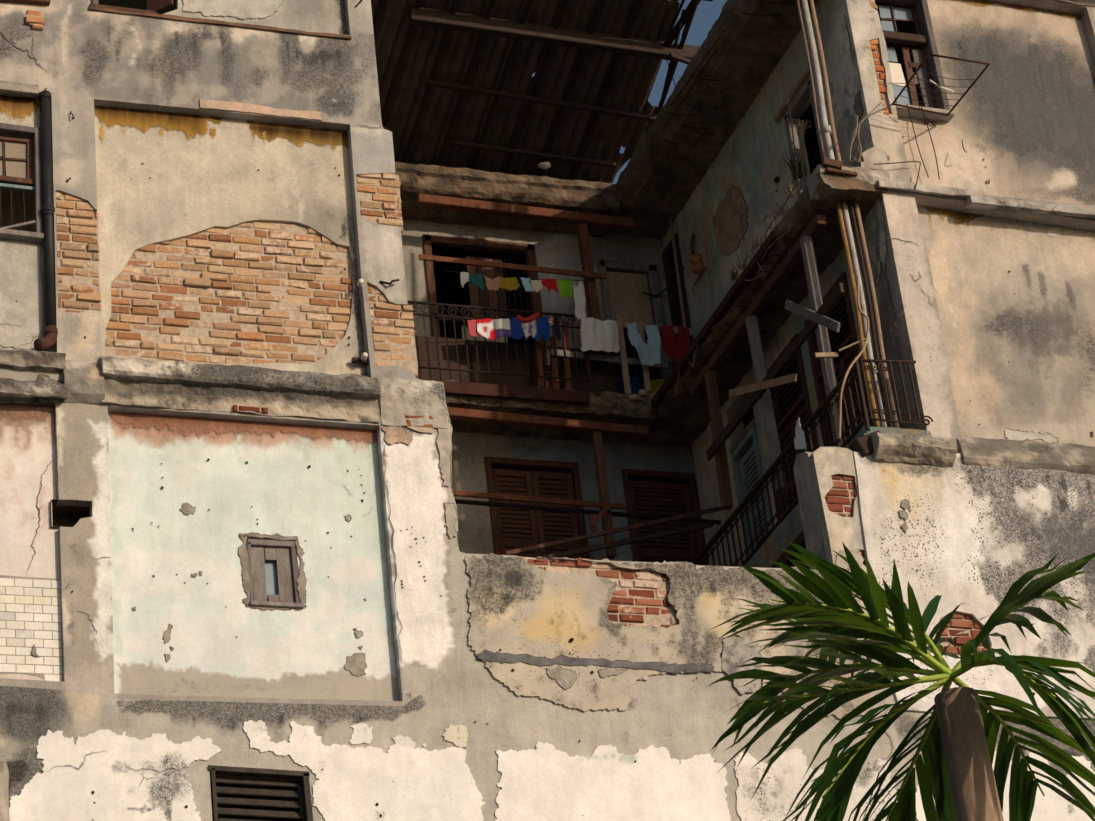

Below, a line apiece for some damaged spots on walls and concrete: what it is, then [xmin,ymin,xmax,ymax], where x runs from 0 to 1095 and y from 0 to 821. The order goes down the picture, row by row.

leakage [957,35,1095,164]
spalling [0,240,45,351]
flaking render [56,178,353,364]
crack [27,461,52,571]
leakage [1023,476,1095,582]
peeling [464,553,874,720]
mould [7,760,29,788]
peeling [9,729,222,821]
peeling [242,720,841,821]
peeling [843,759,897,821]
peeling [916,784,935,821]
peeling [1027,752,1095,821]